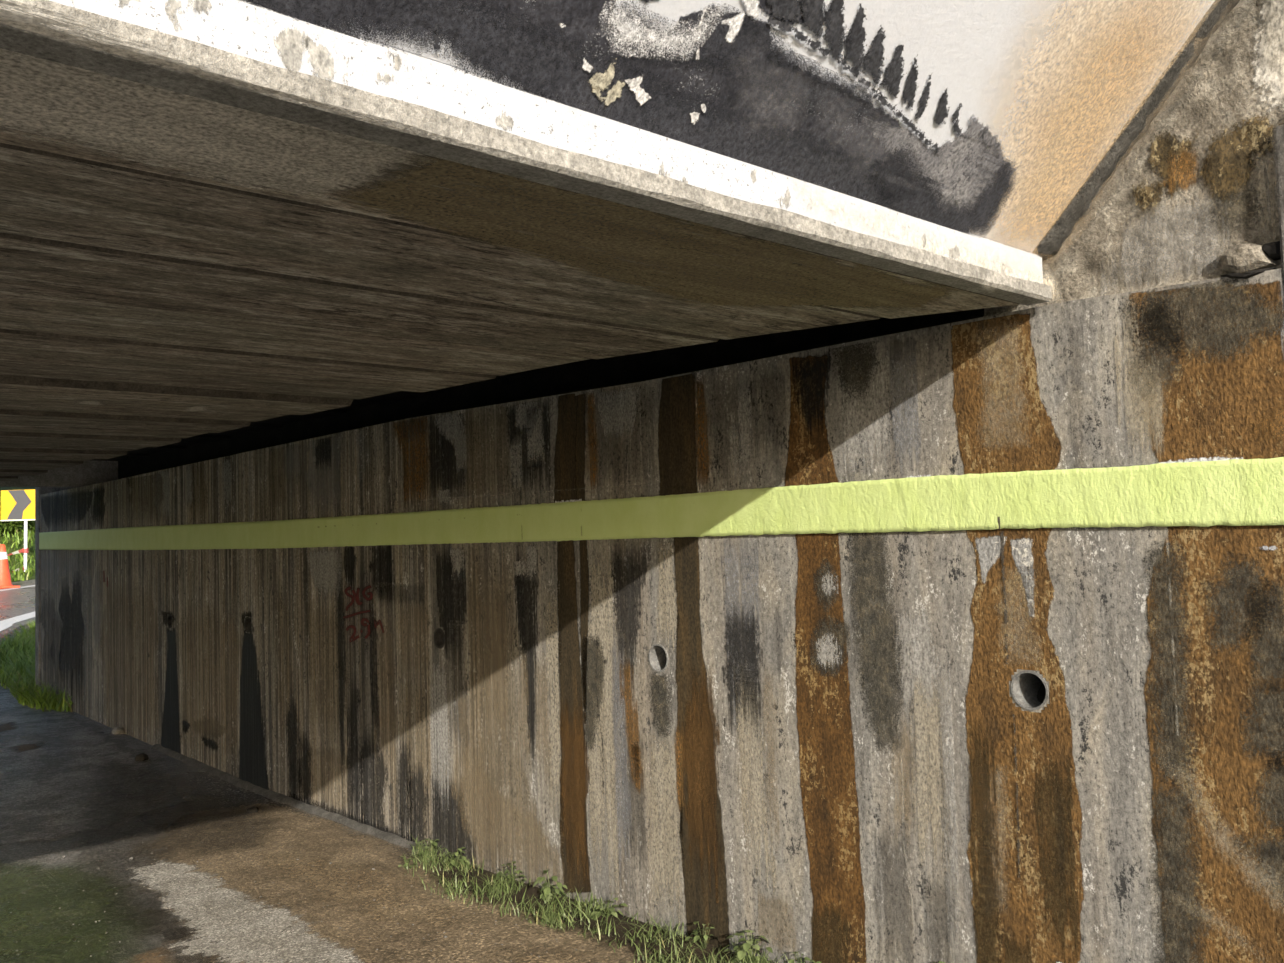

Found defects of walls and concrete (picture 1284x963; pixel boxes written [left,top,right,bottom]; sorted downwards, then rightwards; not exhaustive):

peeling [165,0,211,30]
leakage [0,0,408,132]
peeling [274,28,349,85]
leakage [0,48,958,310]
peeling [582,58,651,106]
peeling [690,104,706,125]
leakage [658,374,698,496]
corrosion [1120,278,1284,463]
leakage [513,537,777,949]
corrosion [795,533,867,963]
corrosion [965,528,1084,963]
corrosion [1142,525,1284,963]